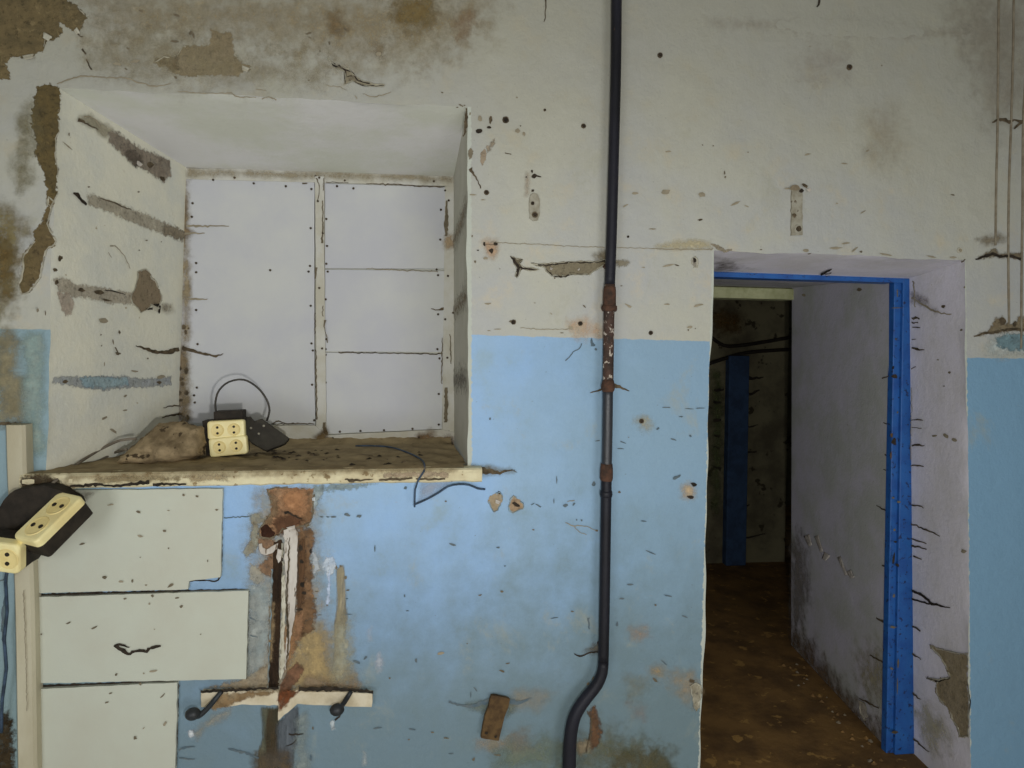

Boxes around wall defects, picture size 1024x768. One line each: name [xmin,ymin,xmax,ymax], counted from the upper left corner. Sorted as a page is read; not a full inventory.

flaking render [0,0,88,80]
flaking render [153,13,252,79]
damp [113,0,473,52]
flaking render [18,83,185,315]
flaking render [510,256,605,279]
flaking render [974,316,1024,337]
crack [882,281,951,471]
peeling [488,491,541,513]
crack [911,504,939,560]
peeling [214,513,298,689]
crack [912,590,950,660]
flaking render [926,644,971,738]